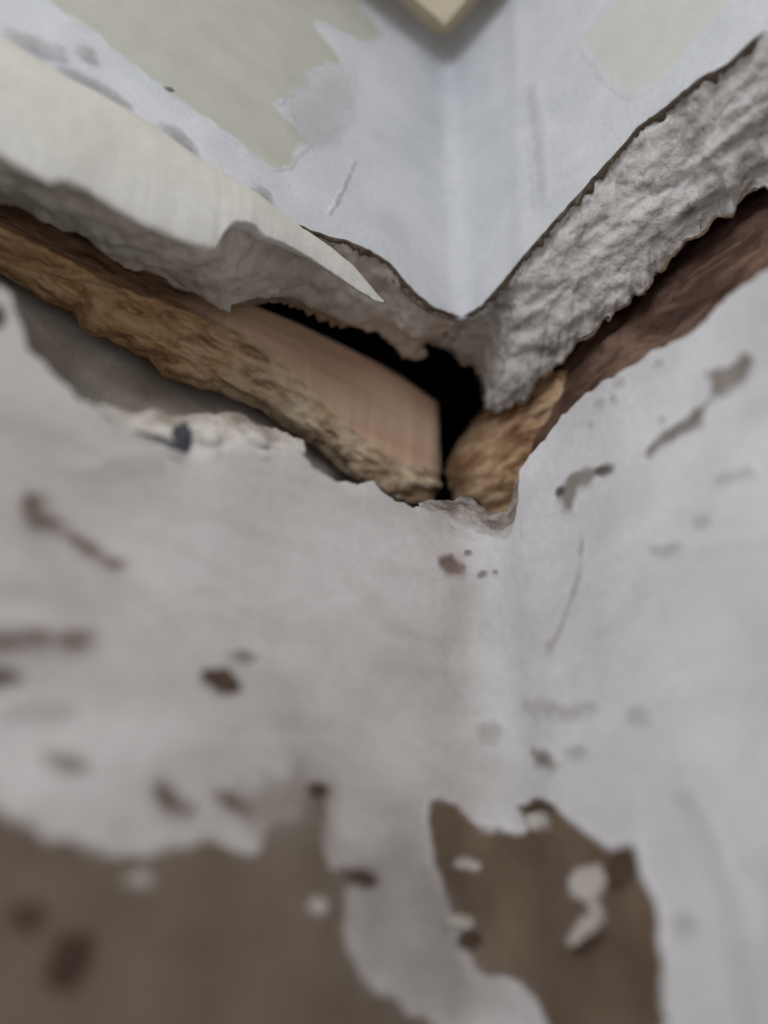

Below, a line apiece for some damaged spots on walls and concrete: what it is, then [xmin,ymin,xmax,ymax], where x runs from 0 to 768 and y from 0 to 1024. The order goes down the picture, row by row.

peeling [40,0,385,173]
flaking render [0,30,768,414]
flaking render [97,403,306,462]
flaking render [418,478,519,539]
peeling [0,773,444,1024]
peeling [422,790,678,1024]